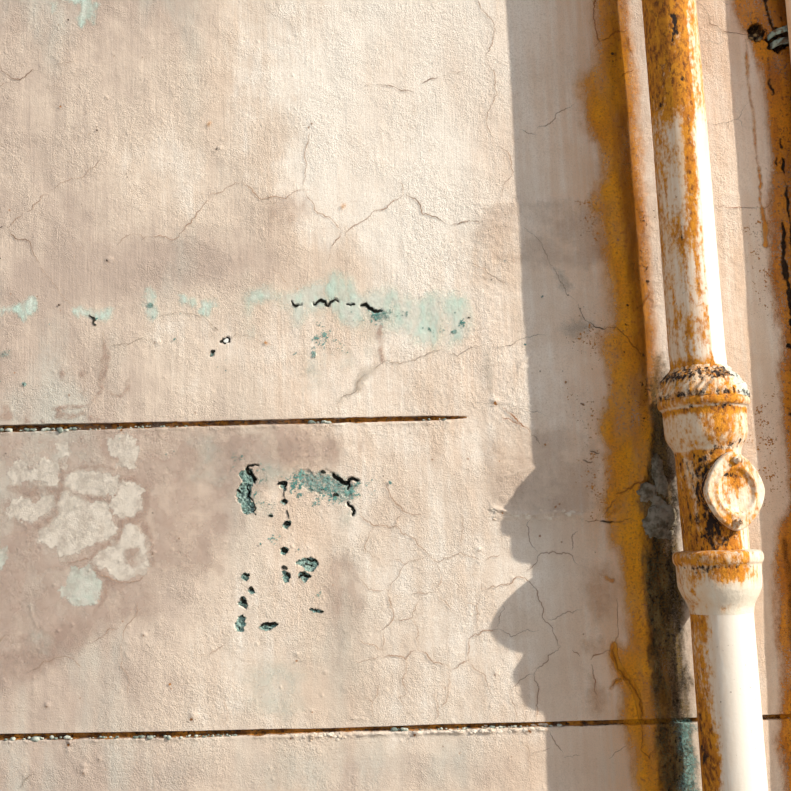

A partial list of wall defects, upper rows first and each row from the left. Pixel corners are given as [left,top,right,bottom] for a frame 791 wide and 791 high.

crack [0,161,99,259]
crack [121,134,478,260]
peeling [289,274,470,342]
rust [566,0,671,791]
rust [733,0,791,791]
flaking render [230,455,375,555]
flaking render [235,573,255,632]
flaking render [259,622,278,631]
flaking render [281,549,318,583]
crack [356,482,650,759]
water stain [629,356,694,791]